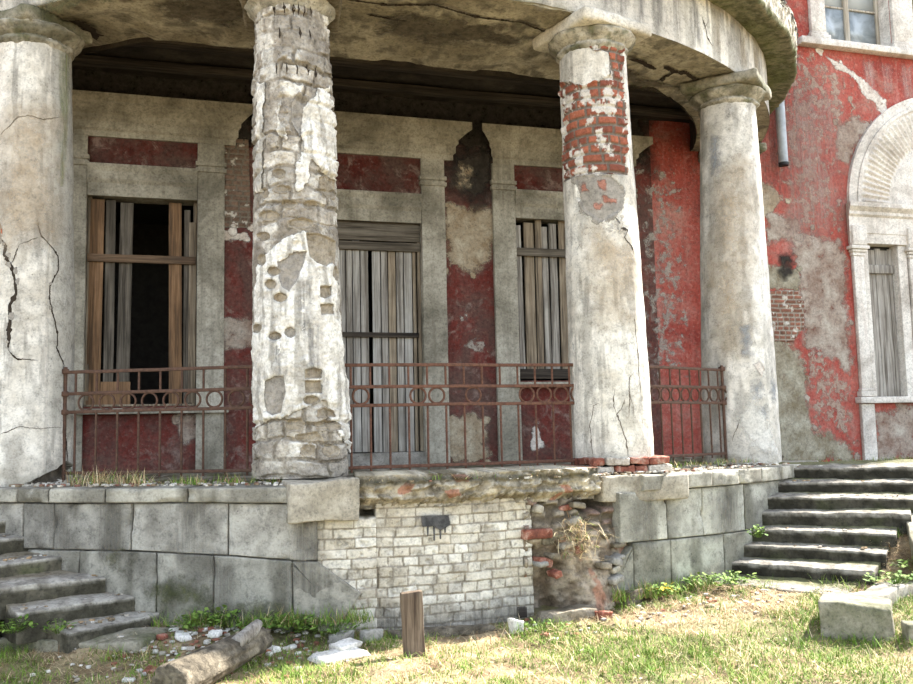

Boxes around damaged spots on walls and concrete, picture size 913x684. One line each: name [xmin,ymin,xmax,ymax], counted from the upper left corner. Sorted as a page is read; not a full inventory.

crack [1,115,59,134]
flaking render [558,45,680,239]
crack [628,59,701,82]
crack [0,224,65,369]
peeling [224,82,352,458]
peeling [445,202,493,278]
peeling [642,169,687,366]
peeling [740,48,887,462]
crack [1,426,68,462]